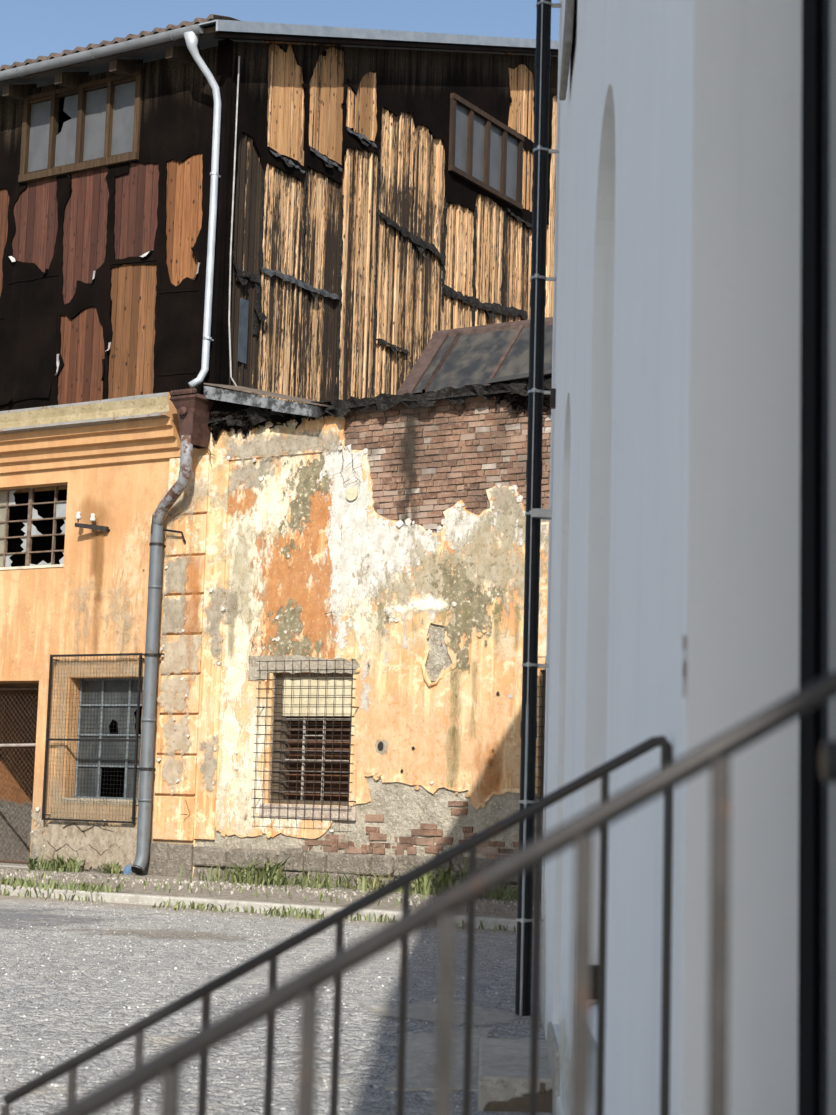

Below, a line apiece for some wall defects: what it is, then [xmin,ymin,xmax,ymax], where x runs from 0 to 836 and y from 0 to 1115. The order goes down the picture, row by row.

peeling [264,41,379,173]
peeling [0,153,203,405]
peeling [229,237,339,336]
peeling [379,210,446,266]
peeling [376,338,409,354]
spalling [541,405,551,509]
leakage [360,412,526,703]
leakage [540,532,549,577]
spalling [196,396,528,864]